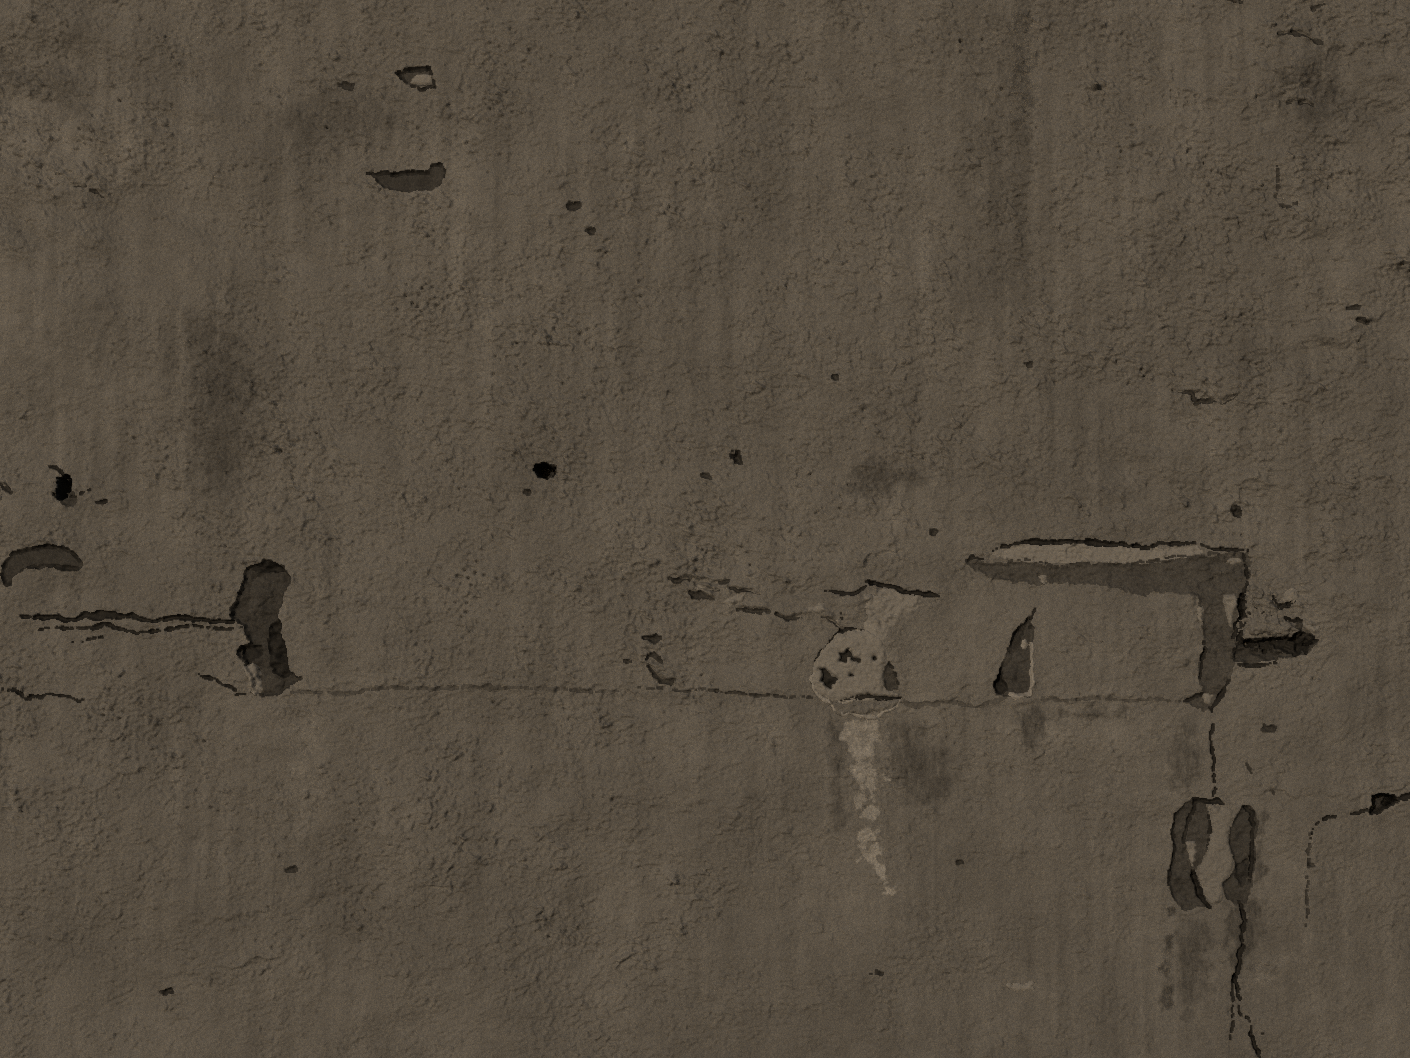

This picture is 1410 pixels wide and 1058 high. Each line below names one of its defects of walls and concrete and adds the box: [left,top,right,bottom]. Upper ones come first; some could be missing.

flaking render [394,65,436,91]
flaking render [366,162,446,193]
flaking render [0,543,83,587]
crack [19,610,243,643]
flaking render [229,558,302,697]
crack [290,579,940,699]
flaking render [808,587,921,720]
flaking render [965,538,1323,712]
efflorescence [839,714,896,895]
flaking render [1167,797,1259,911]
crack [1304,792,1410,927]
crack [1229,903,1264,1058]